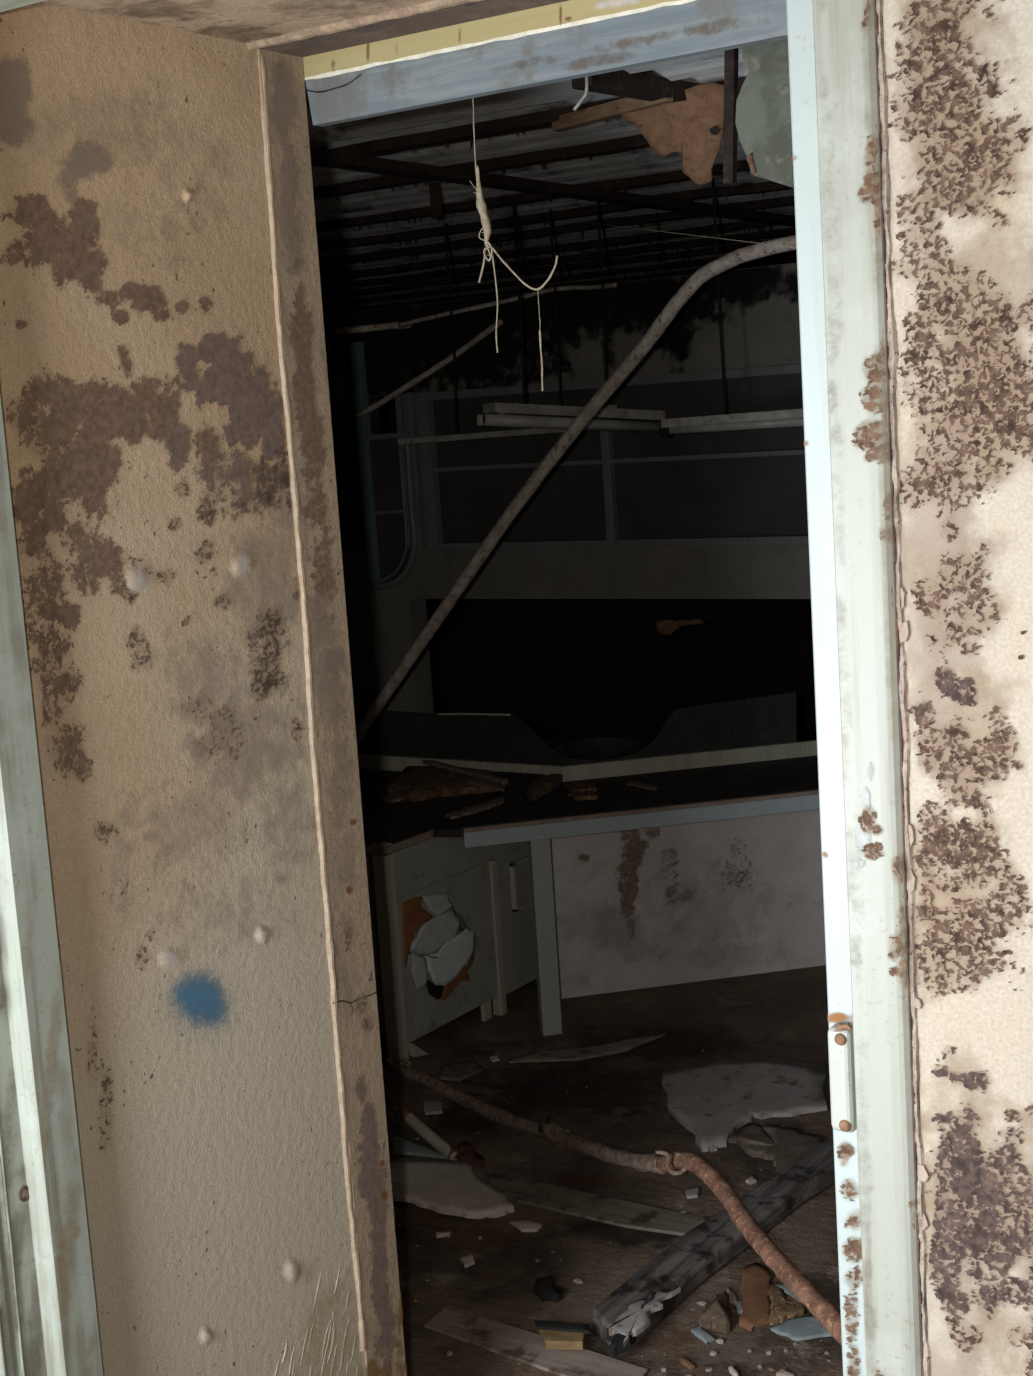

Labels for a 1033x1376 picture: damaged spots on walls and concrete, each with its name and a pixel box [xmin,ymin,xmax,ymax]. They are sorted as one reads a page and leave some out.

leakage [0,60,343,787]
leakage [616,827,694,939]
corrosion [858,810,884,860]
corrosion [827,1013,853,1032]
corrosion [836,1144,853,1159]
corrosion [839,1179,863,1376]